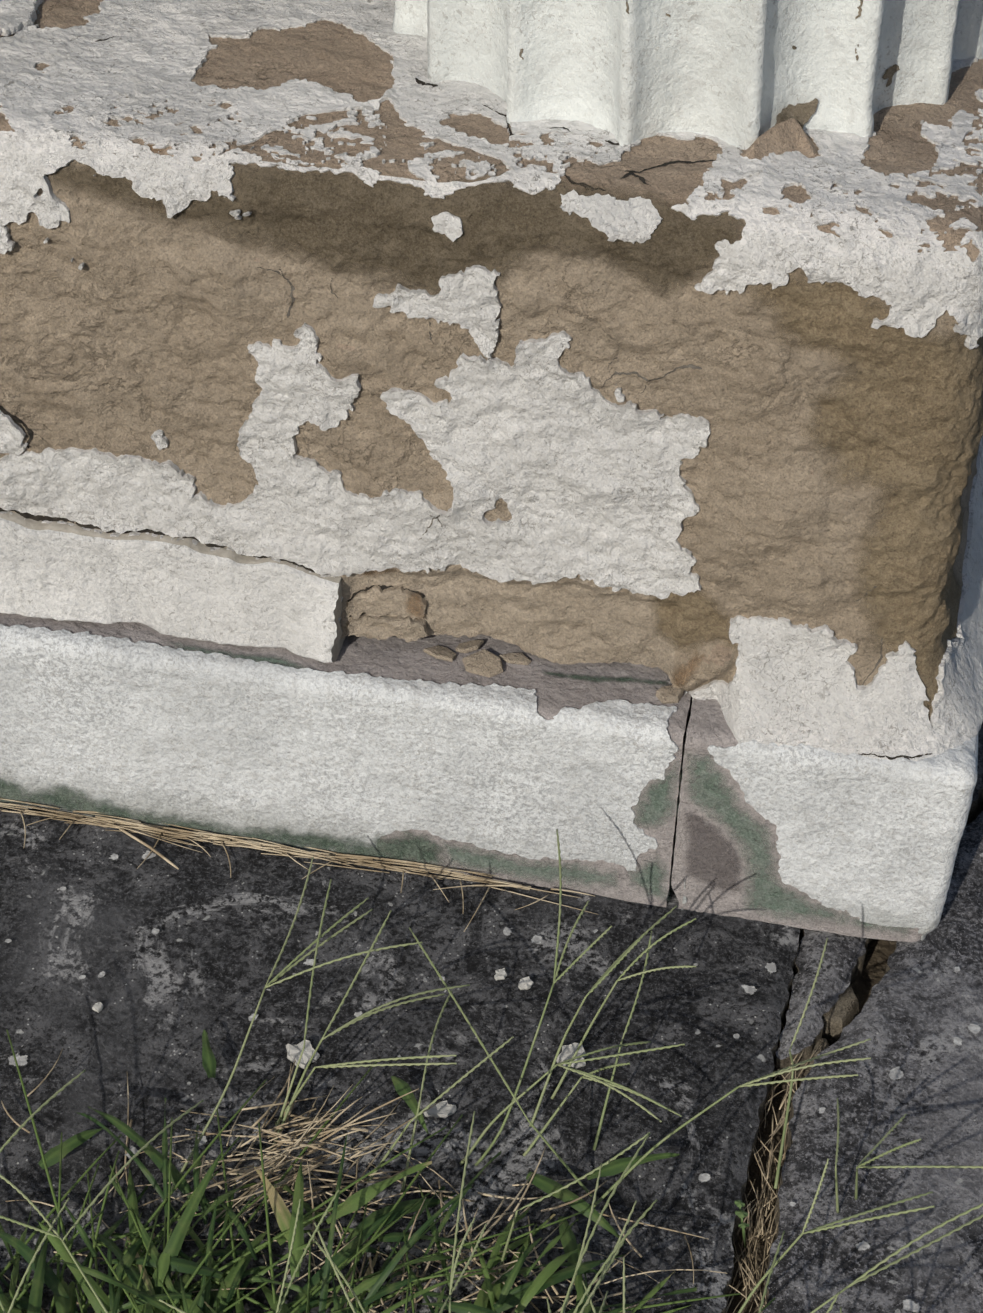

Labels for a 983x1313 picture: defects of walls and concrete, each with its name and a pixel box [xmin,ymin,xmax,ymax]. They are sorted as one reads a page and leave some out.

peeling [0,0,104,37]
peeling [861,59,983,262]
peeling [924,310,967,341]
crack [0,405,34,448]
crack [0,507,425,617]
peeling [0,20,922,942]
peeling [953,444,980,588]
leakage [688,815,739,889]